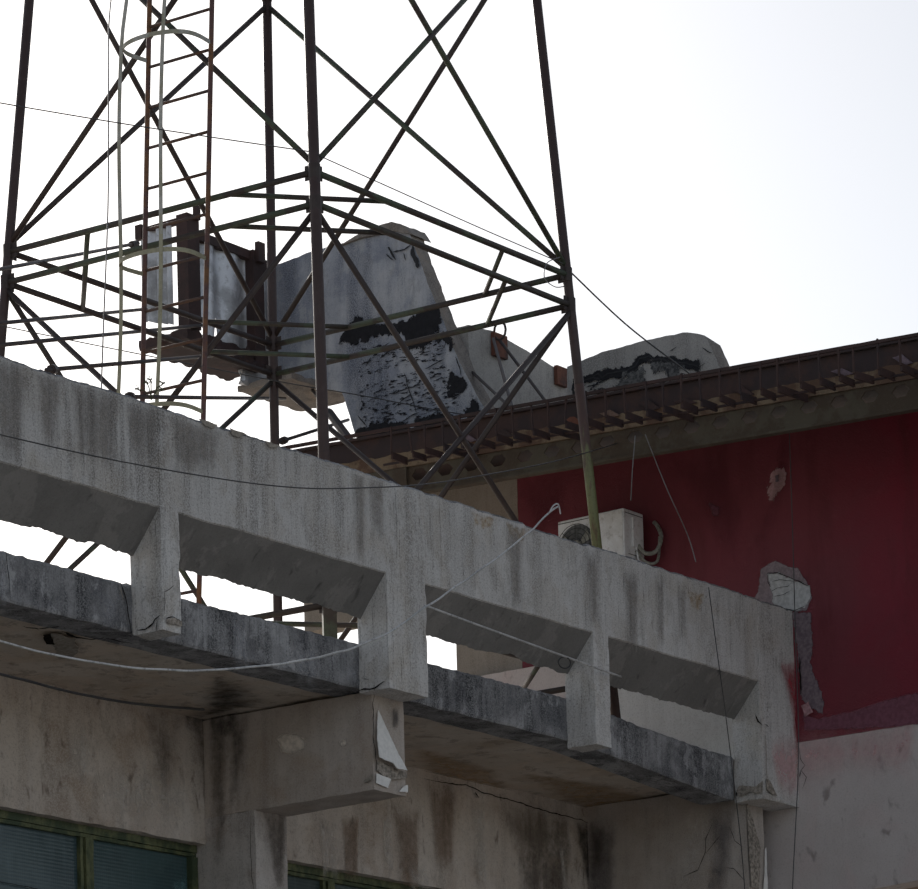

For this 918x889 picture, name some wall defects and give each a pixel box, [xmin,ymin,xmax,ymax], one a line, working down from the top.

peeling [767,467,787,501]
peeling [754,561,918,730]
flaking render [364,710,408,792]
crack [427,779,587,823]